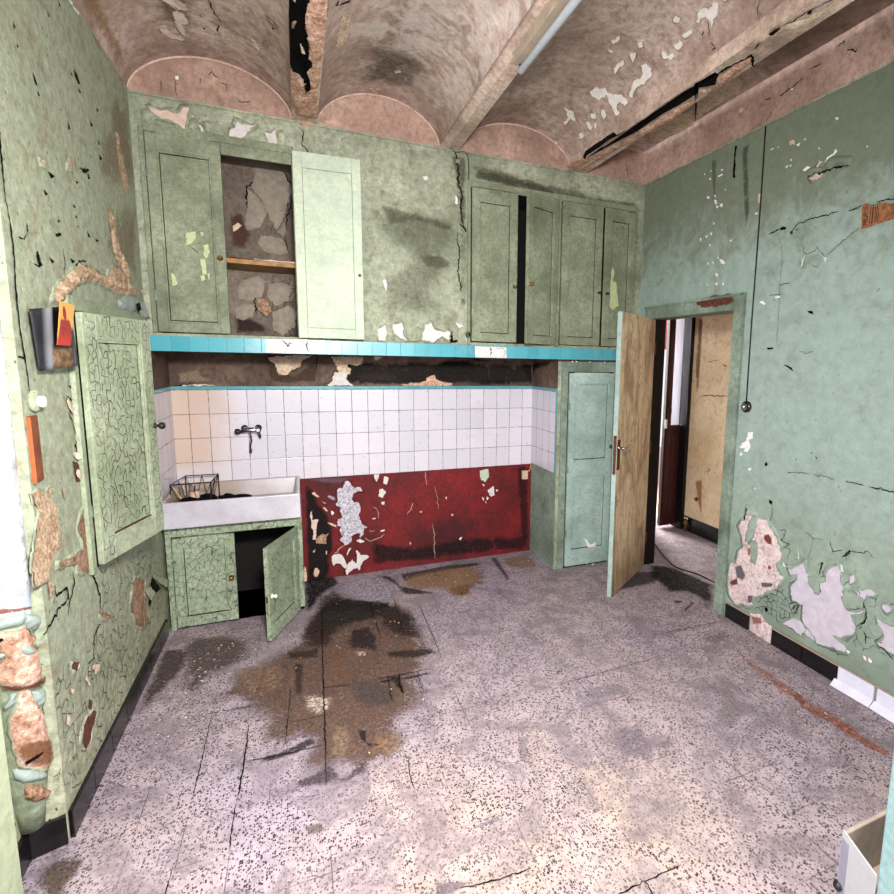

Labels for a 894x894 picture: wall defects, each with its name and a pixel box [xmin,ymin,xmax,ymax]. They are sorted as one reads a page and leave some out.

flaking render [289,0,352,152]
crack [566,0,843,171]
crack [0,133,30,391]
peeling [234,276,313,377]
flaking render [324,355,381,386]
peeling [310,474,389,575]
peeling [726,504,894,660]
flaking render [0,625,53,802]
crack [192,595,352,848]
corrosion [739,653,888,754]
crack [461,868,531,888]
crack [618,865,679,894]